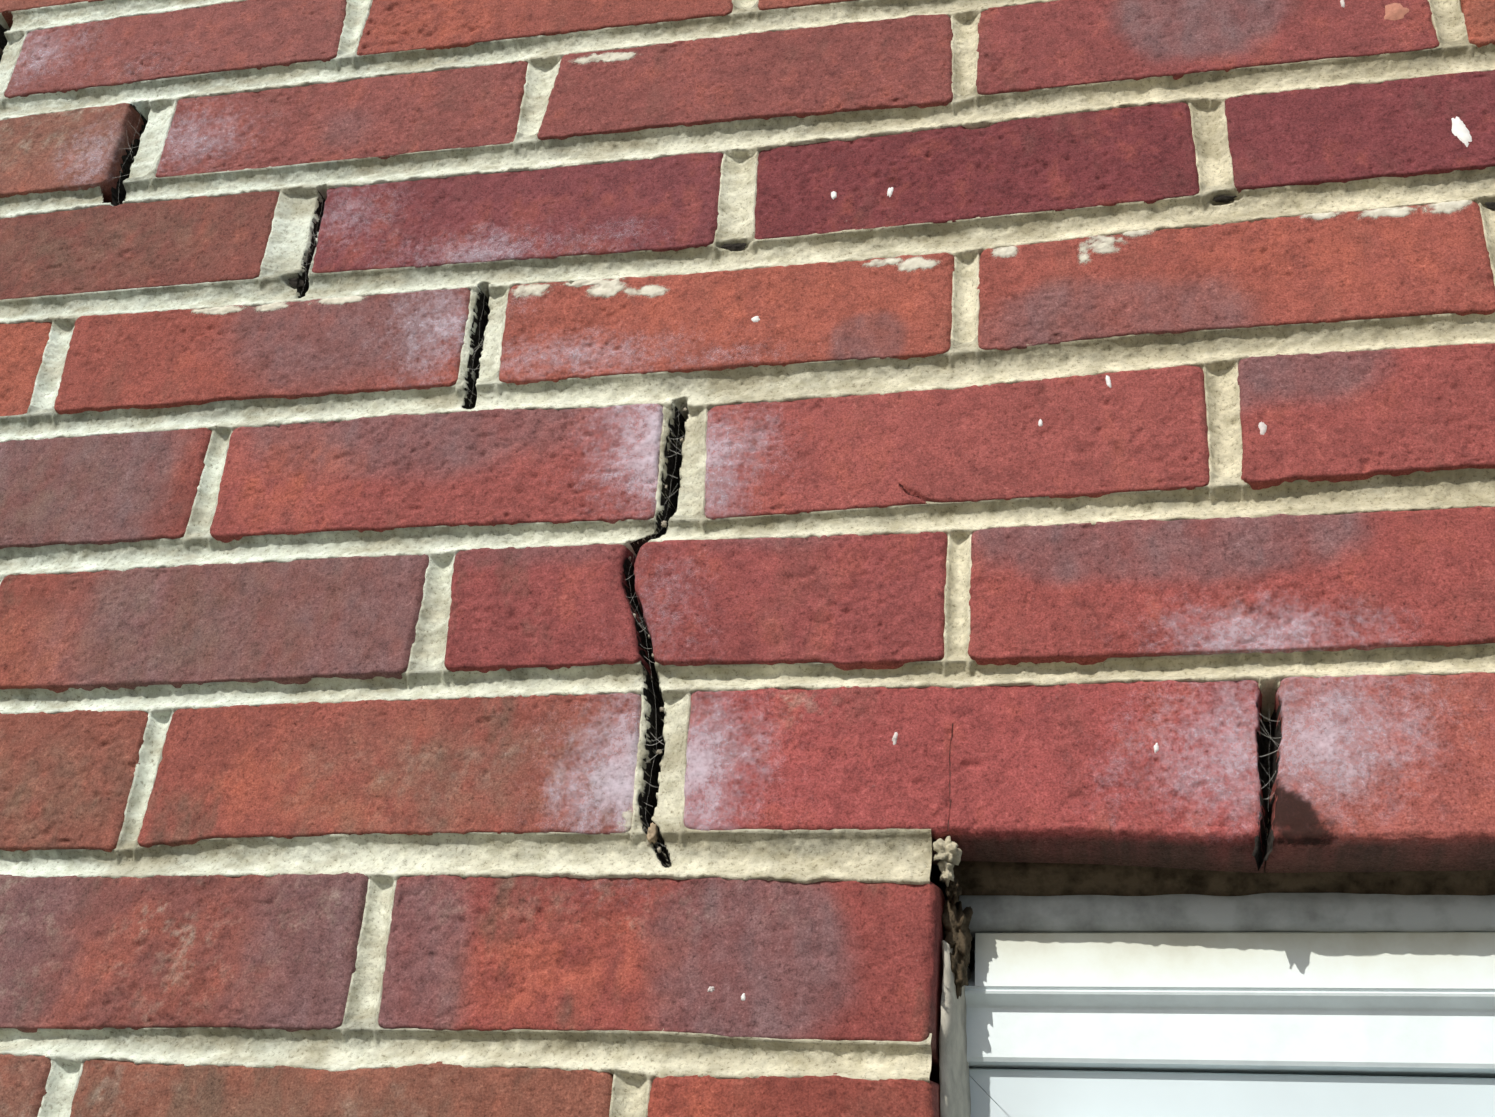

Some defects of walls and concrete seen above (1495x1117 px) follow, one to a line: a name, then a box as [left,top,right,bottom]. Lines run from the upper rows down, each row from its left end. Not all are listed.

crack [0,24,8,62]
crack [111,105,148,206]
crack [296,189,326,299]
crack [462,286,491,409]
crack [622,402,689,868]
crack [1252,696,1282,871]